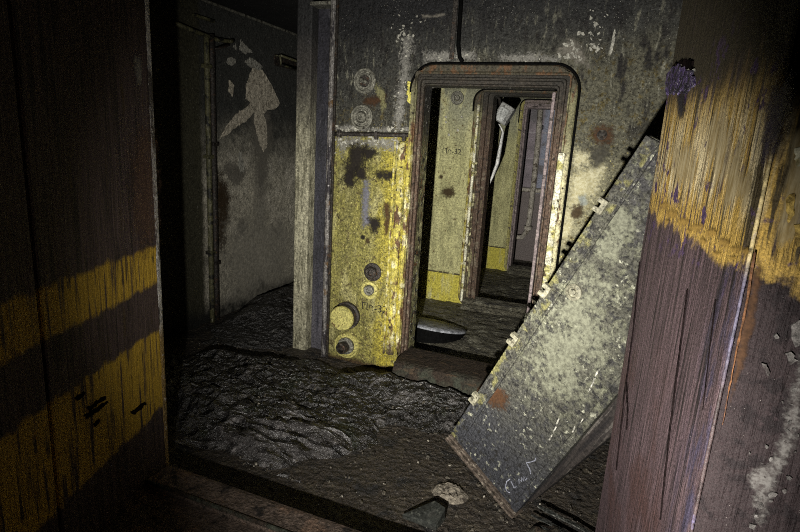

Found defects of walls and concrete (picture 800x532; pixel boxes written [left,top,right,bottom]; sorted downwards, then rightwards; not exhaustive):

peeling [335,14,480,157]
peeling [499,9,616,67]
corrosion [722,252,760,425]
spalling [749,320,800,530]